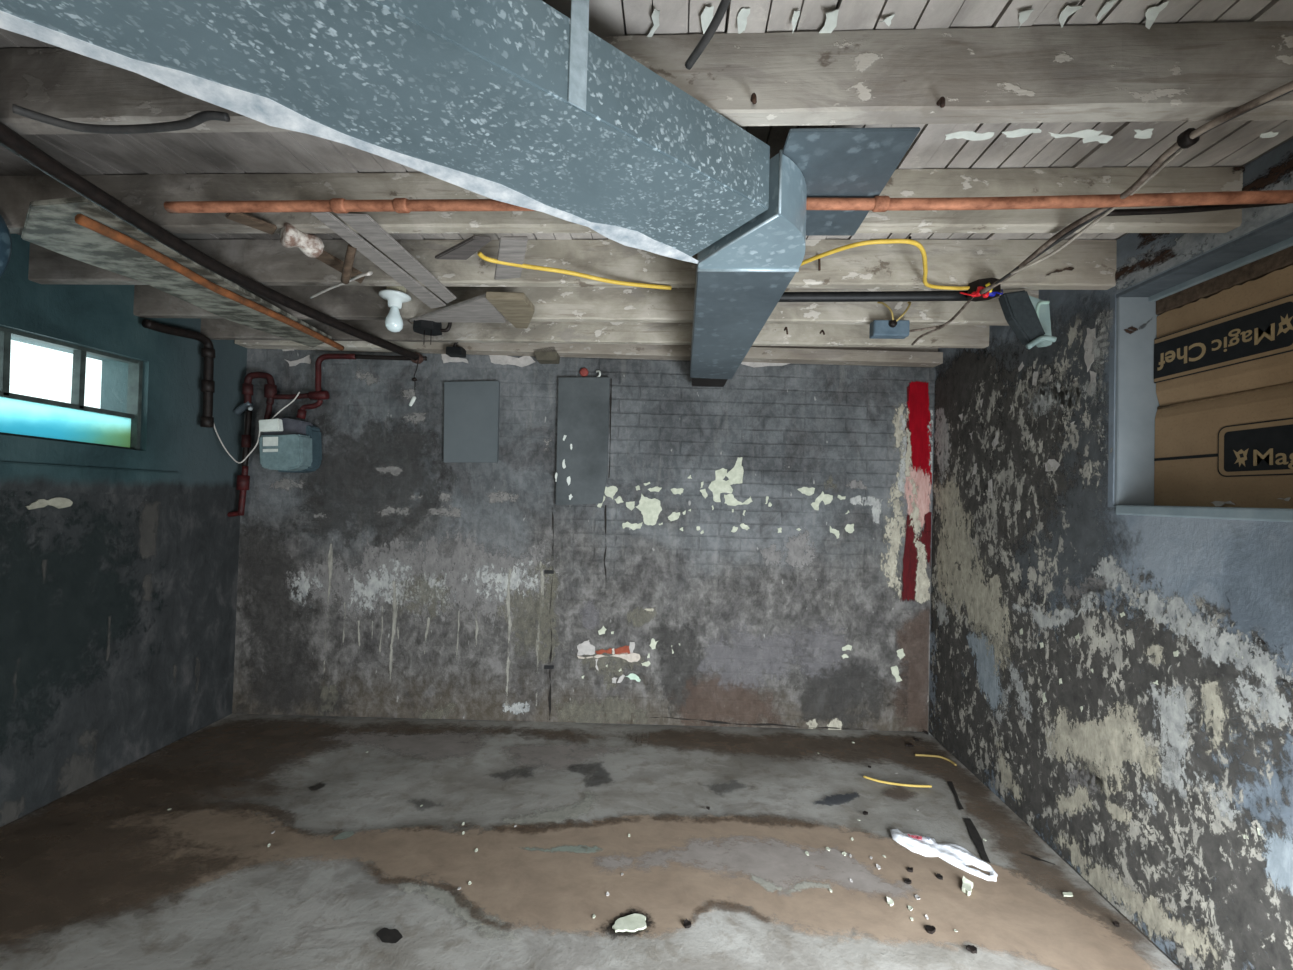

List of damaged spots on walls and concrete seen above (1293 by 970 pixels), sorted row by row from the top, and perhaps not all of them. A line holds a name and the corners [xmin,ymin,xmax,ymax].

peeling [701,6,714,34]
peeling [819,9,839,33]
peeling [1058,5,1083,28]
peeling [1096,0,1117,21]
peeling [1145,1,1169,29]
peeling [945,128,1113,143]
peeling [1134,129,1153,139]
peeling [1010,308,1113,466]
peeling [597,457,772,534]
peeling [798,477,867,539]
water stain [0,298,1293,970]
spalling [577,626,680,689]